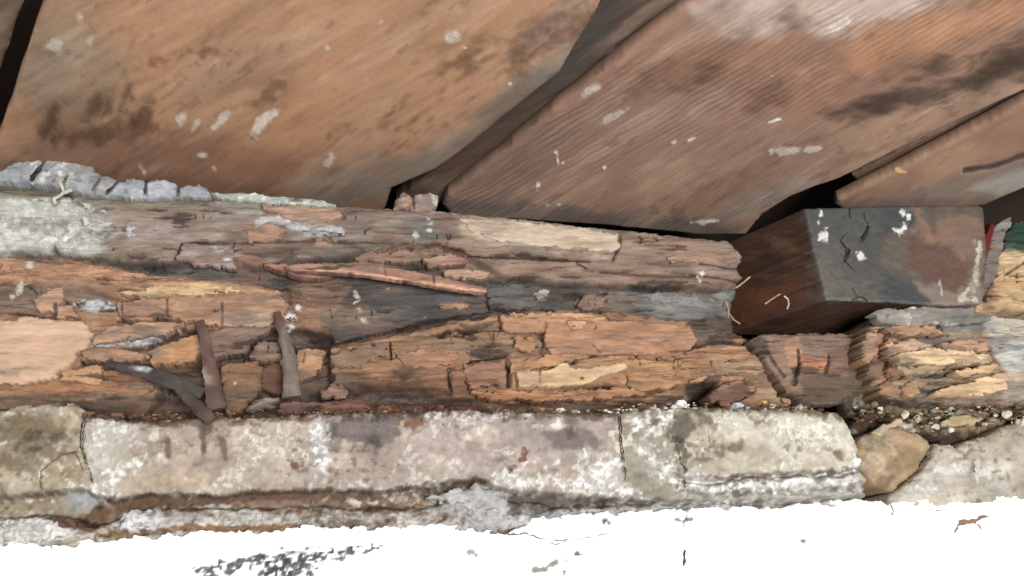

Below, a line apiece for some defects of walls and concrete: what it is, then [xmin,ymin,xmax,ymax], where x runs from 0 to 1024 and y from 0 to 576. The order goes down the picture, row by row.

water stain [854,44,1024,117]
crack [466,254,588,262]
crack [840,208,869,301]
crack [390,312,509,392]
crack [39,412,93,491]